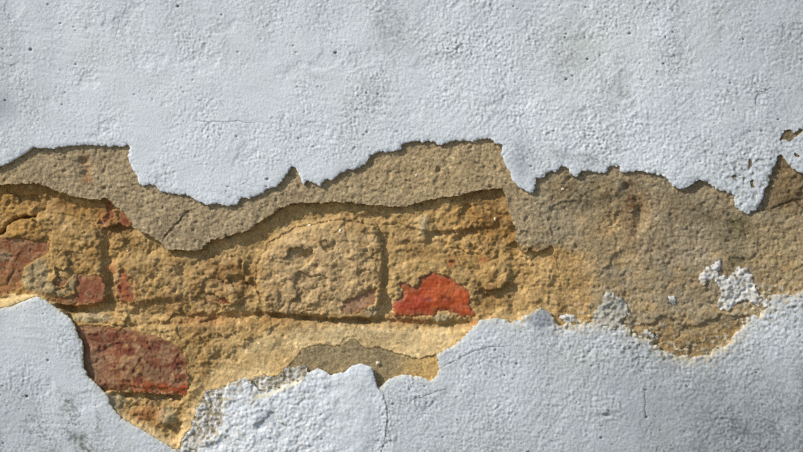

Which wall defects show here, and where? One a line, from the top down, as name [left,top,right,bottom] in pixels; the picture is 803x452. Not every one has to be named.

flaking render [779,129,803,142]
flaking render [0,138,803,452]